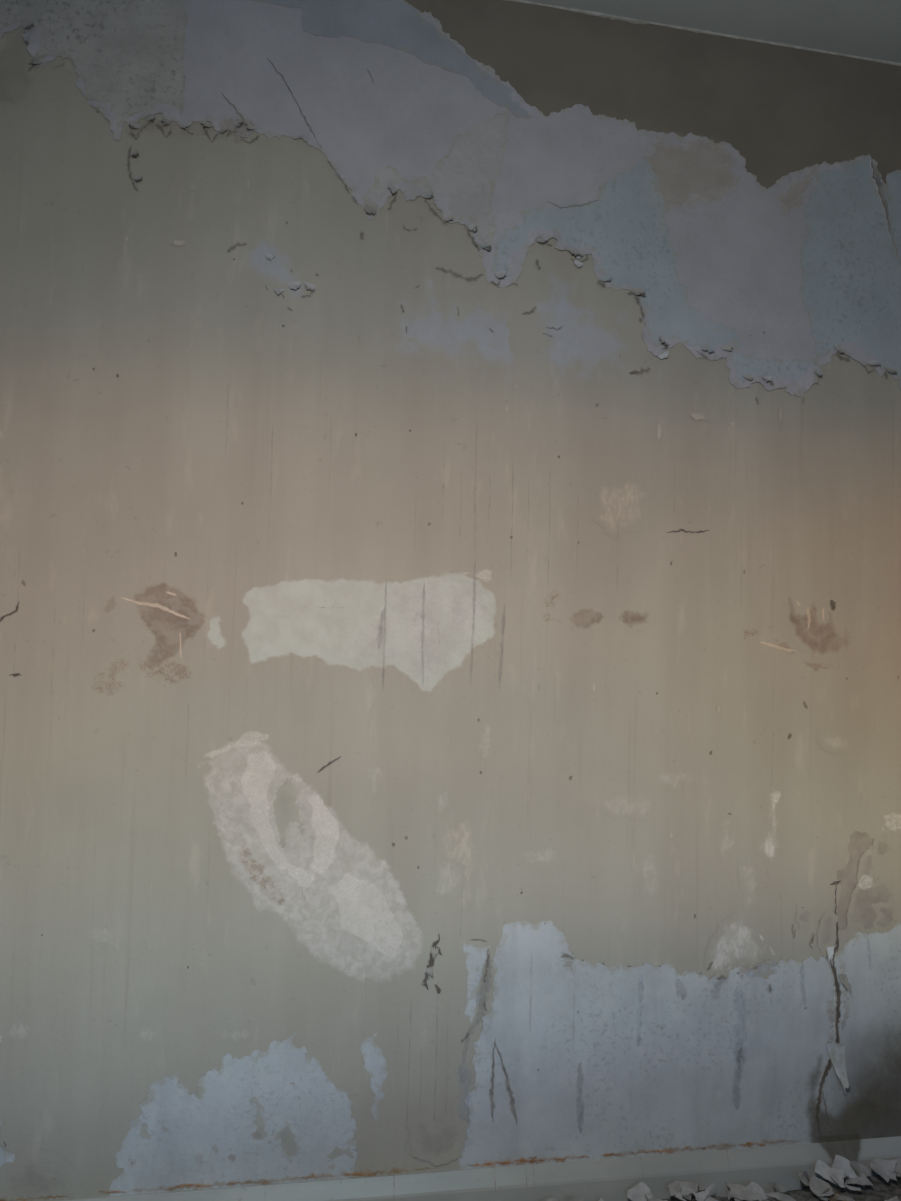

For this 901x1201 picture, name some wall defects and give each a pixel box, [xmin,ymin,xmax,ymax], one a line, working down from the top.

peeling [0,0,901,397]
damp [99,577,210,675]
peeling [109,1033,357,1196]
peeling [360,1032,388,1122]
peeling [458,919,901,1169]
crack [815,880,852,1135]